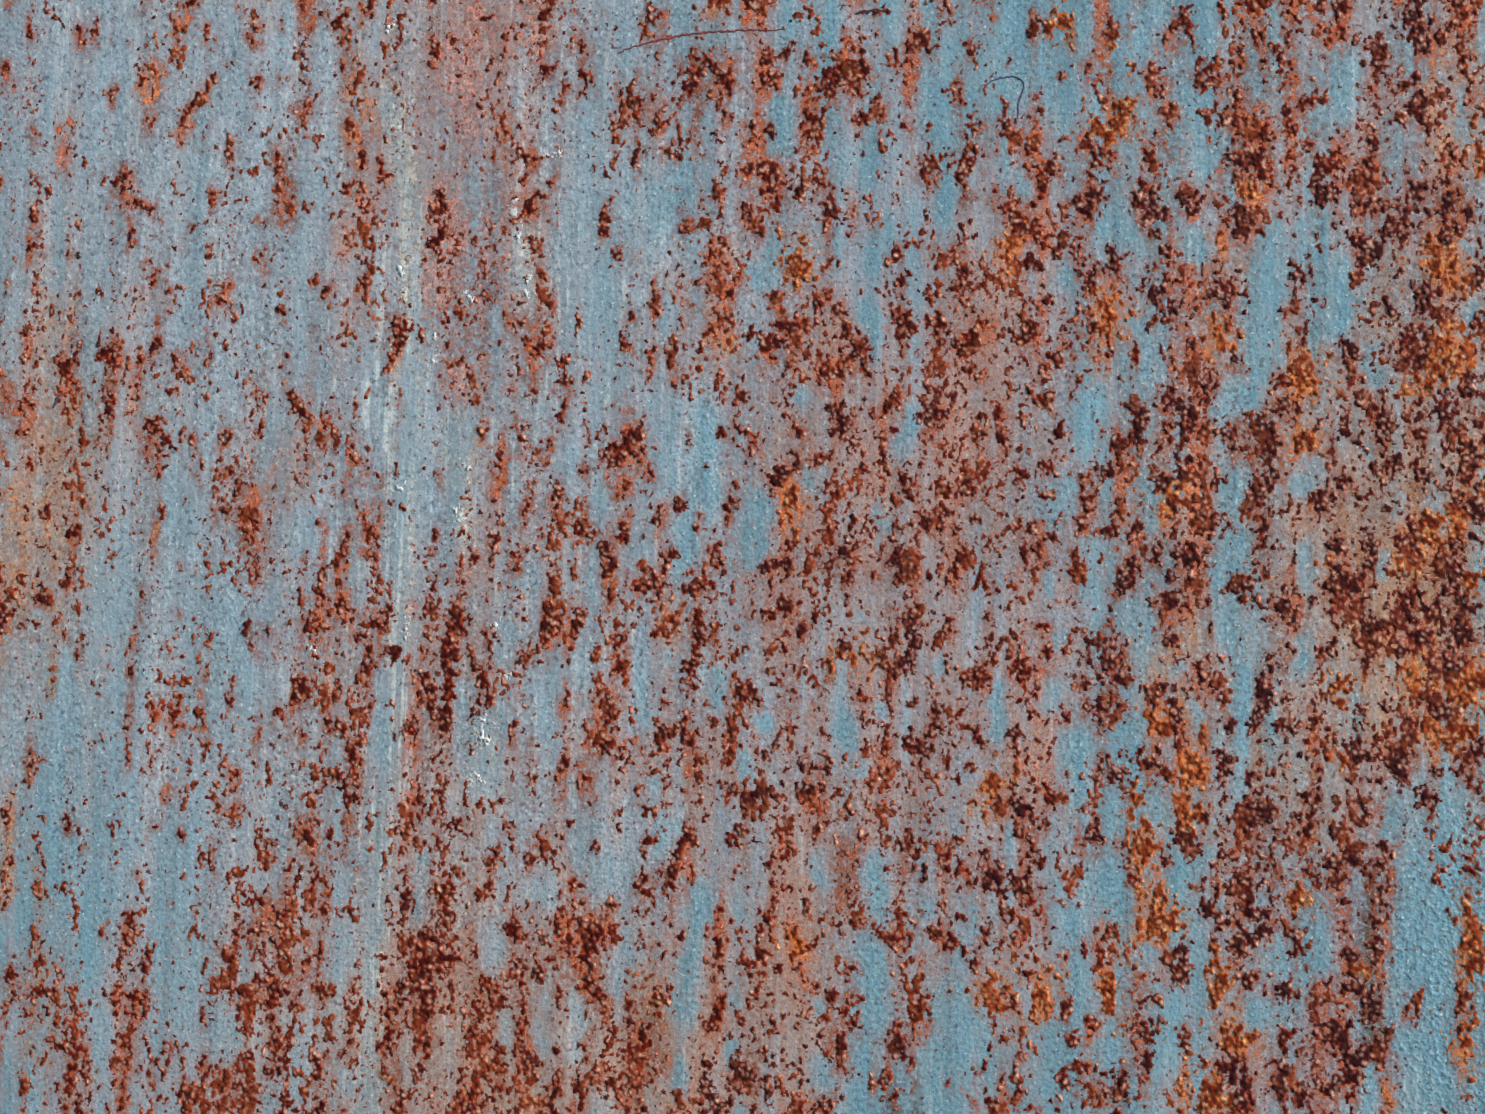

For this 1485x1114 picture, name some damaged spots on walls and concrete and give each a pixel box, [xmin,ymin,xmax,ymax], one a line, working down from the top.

corrosion [227,4,269,50]
corrosion [960,0,1001,70]
corrosion [1026,0,1082,55]
corrosion [57,82,120,109]
corrosion [126,0,235,147]
corrosion [53,214,84,269]
corrosion [101,153,170,267]
corrosion [140,245,186,315]
corrosion [262,278,298,338]
corrosion [574,306,584,347]
corrosion [129,502,167,575]
corrosion [88,769,130,880]